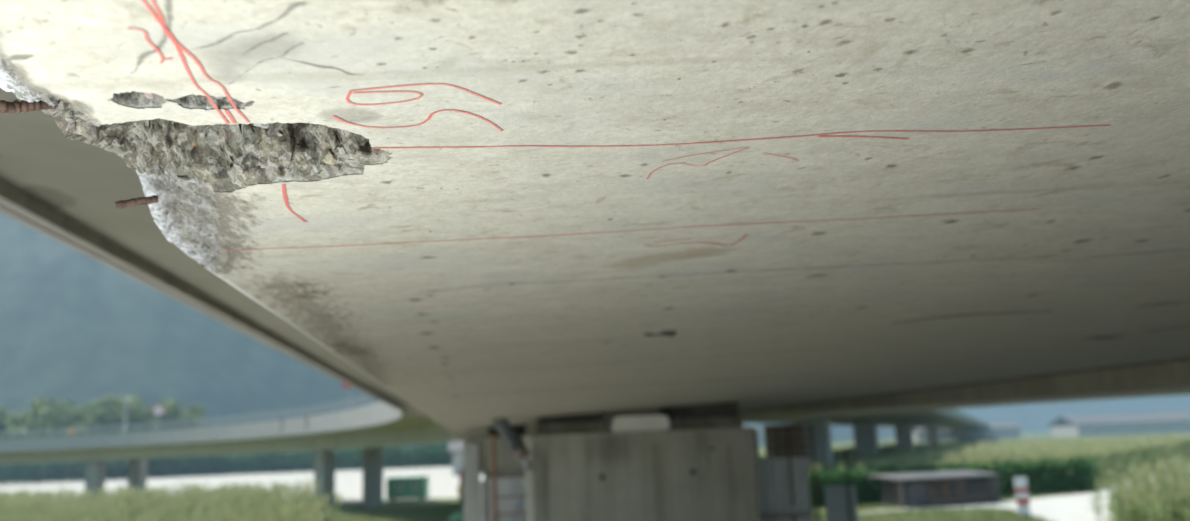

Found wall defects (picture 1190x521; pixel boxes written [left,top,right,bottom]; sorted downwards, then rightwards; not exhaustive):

spalling [0,56,392,275]